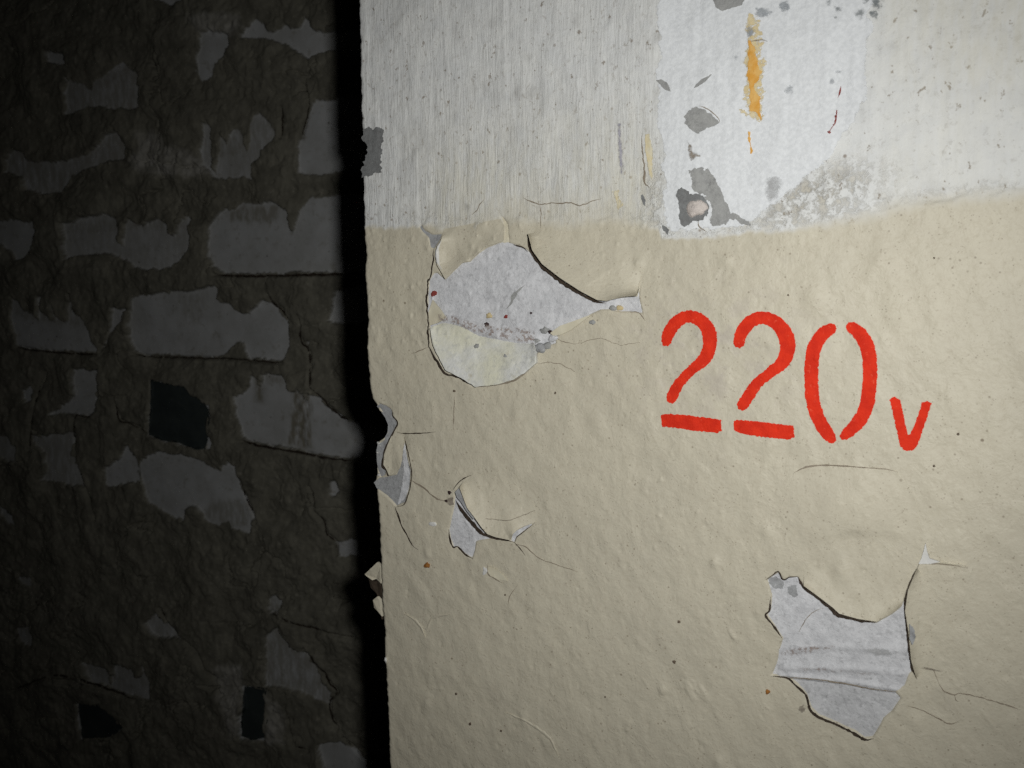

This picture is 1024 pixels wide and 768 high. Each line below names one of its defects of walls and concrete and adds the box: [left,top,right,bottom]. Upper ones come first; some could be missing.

flaking render [713,0,744,11]
flaking render [684,106,720,134]
corrosion [739,13,767,121]
flaking render [661,145,751,235]
peeling [415,198,645,387]
peeling [374,404,578,572]
peeling [765,543,965,741]